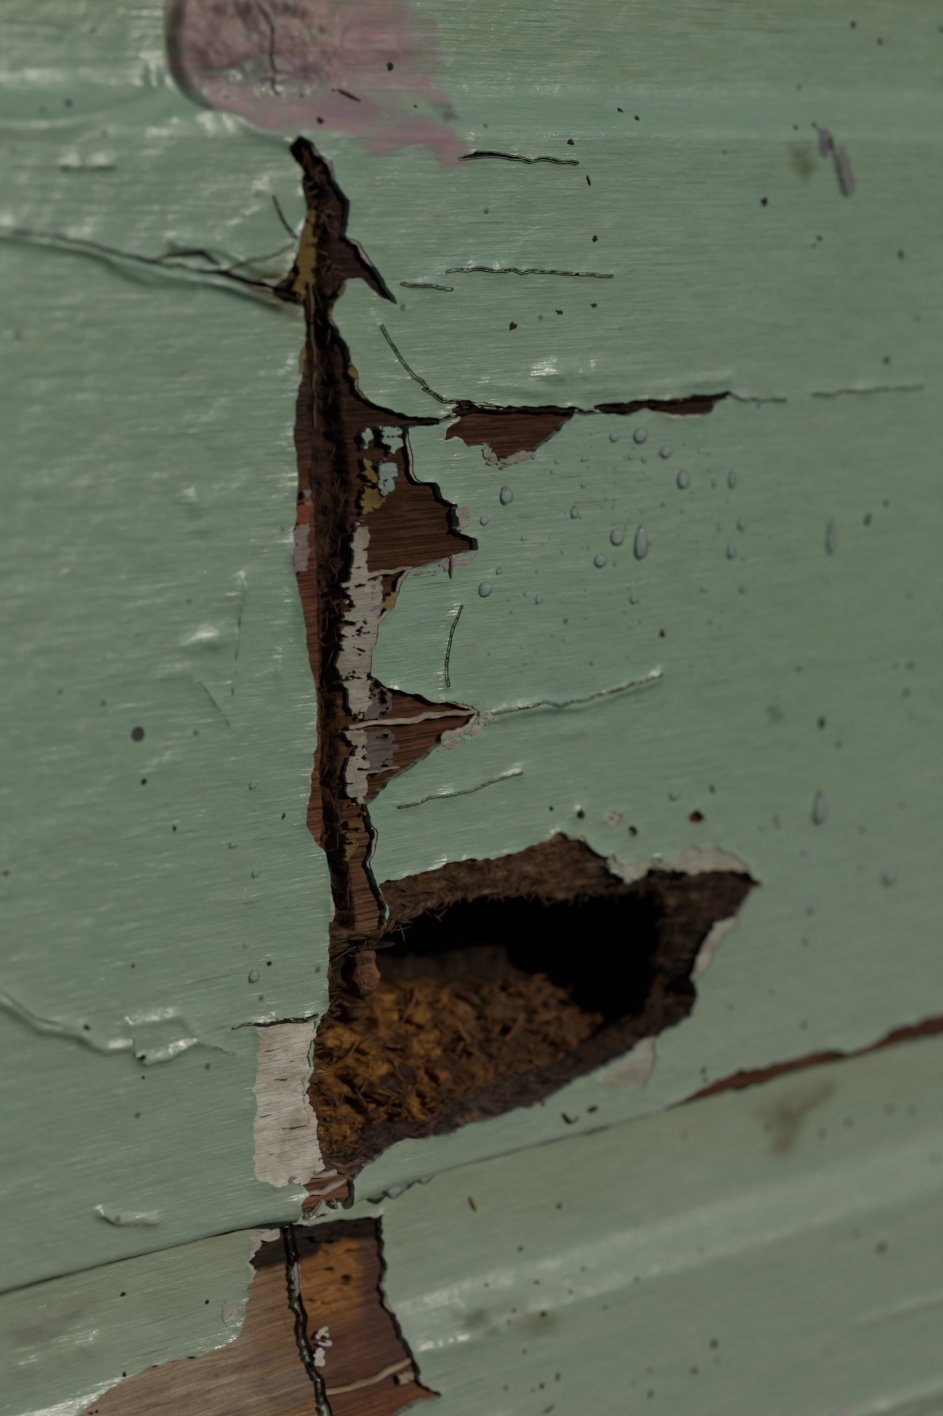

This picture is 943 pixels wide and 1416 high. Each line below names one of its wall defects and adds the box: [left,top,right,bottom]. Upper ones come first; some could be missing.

crack [0,195,302,301]
peeling [245,138,726,941]
peeling [607,845,749,883]
peeling [691,917,738,981]
peeling [600,1038,656,1092]
peeling [666,1014,943,1108]
peeling [79,1018,437,1416]
crack [288,1223,333,1416]